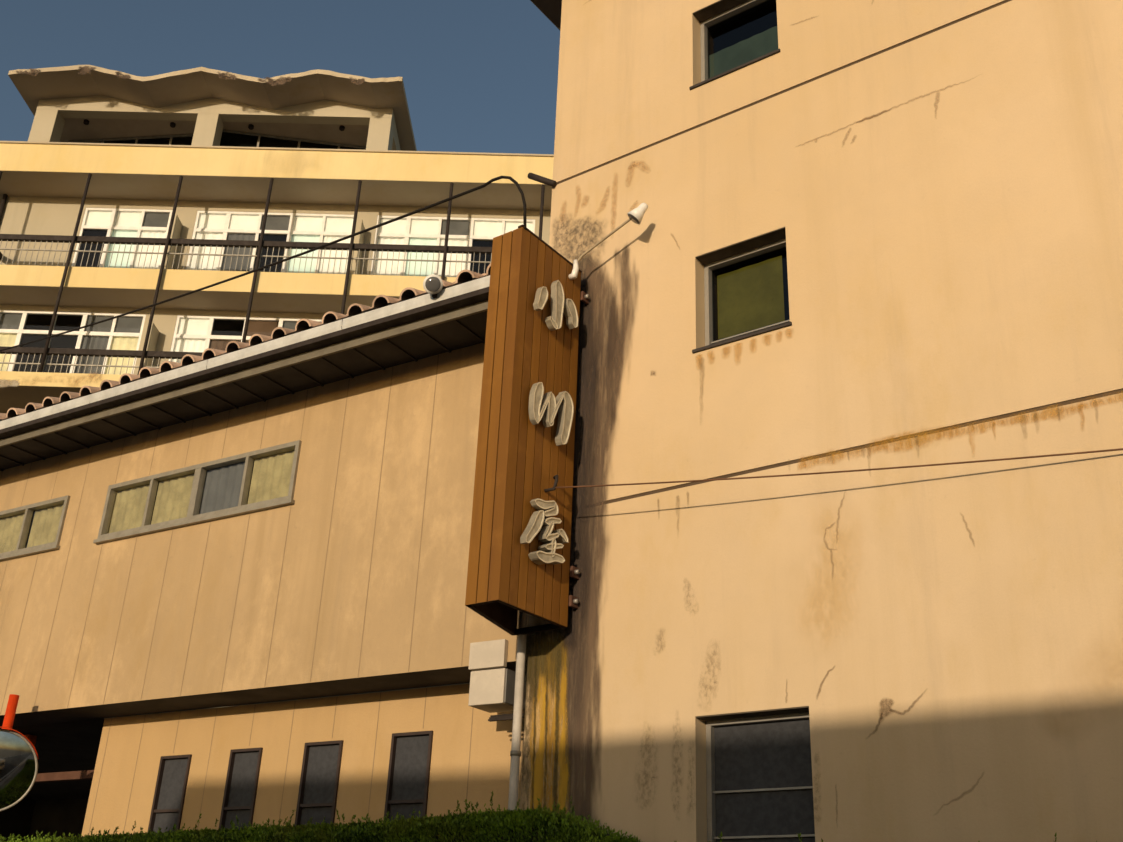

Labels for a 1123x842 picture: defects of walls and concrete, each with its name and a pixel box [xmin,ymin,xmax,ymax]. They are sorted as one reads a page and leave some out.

leakage [521,221,633,828]